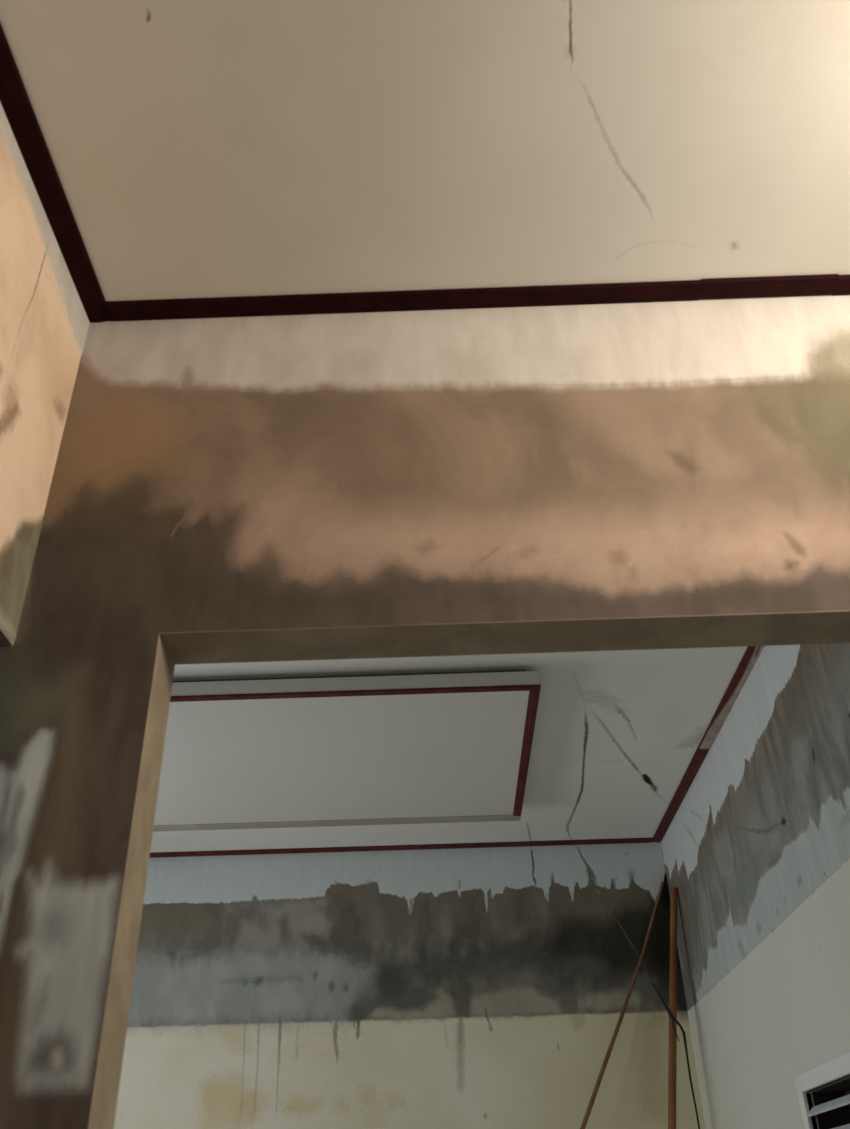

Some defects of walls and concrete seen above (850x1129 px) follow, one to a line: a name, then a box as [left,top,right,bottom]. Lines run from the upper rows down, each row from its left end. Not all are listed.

crack [567,0,575,60]
damp [732,370,850,494]
damp [0,403,850,1129]
crack [567,693,657,885]